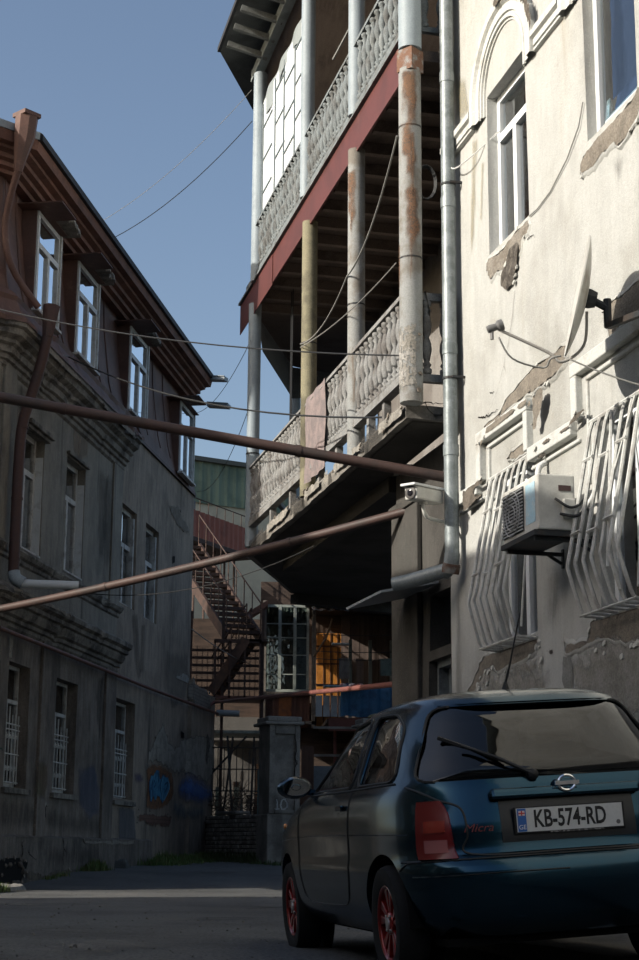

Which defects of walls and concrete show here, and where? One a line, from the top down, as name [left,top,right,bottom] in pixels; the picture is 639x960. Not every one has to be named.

rust [399,71,420,275]
flaking render [486,217,531,289]
flaking render [601,277,639,337]
flaking render [477,341,571,446]
flaking render [506,409,585,463]
peeling [466,607,639,712]